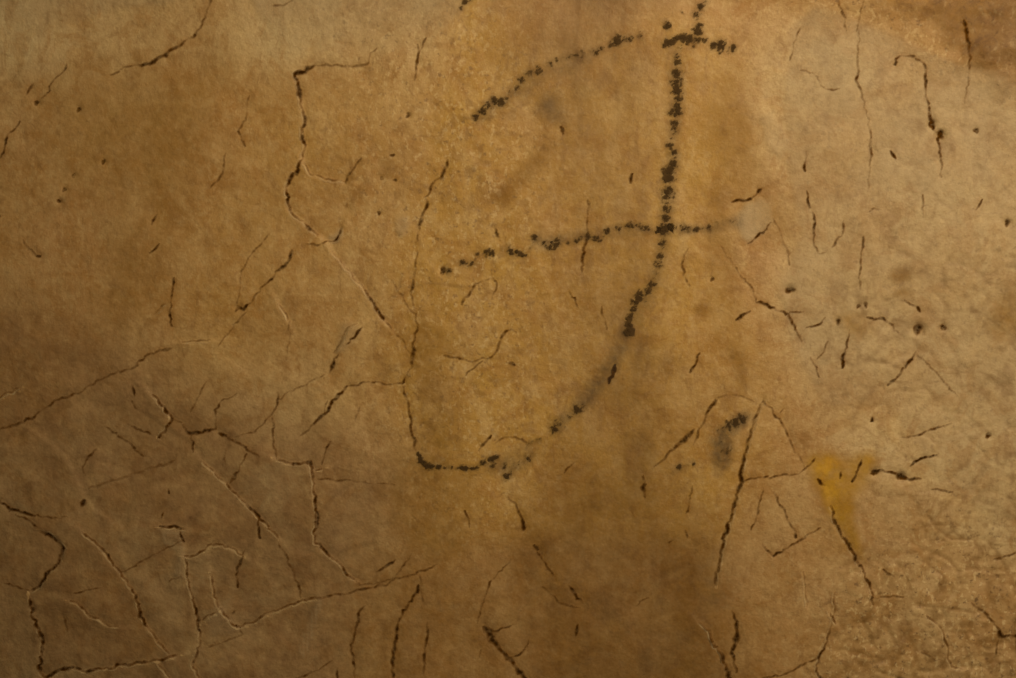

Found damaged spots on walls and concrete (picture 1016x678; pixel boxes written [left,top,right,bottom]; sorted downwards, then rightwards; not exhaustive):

crack [141,1,212,66]
crack [894,55,942,161]
crack [235,64,361,312]
crack [418,161,449,226]
crack [314,290,418,446]
crack [666,402,716,456]
crack [2,349,432,678]
crack [516,504,580,600]
crack [715,414,947,599]
crack [480,612,526,678]
crack [710,614,740,678]
crack [767,619,835,678]